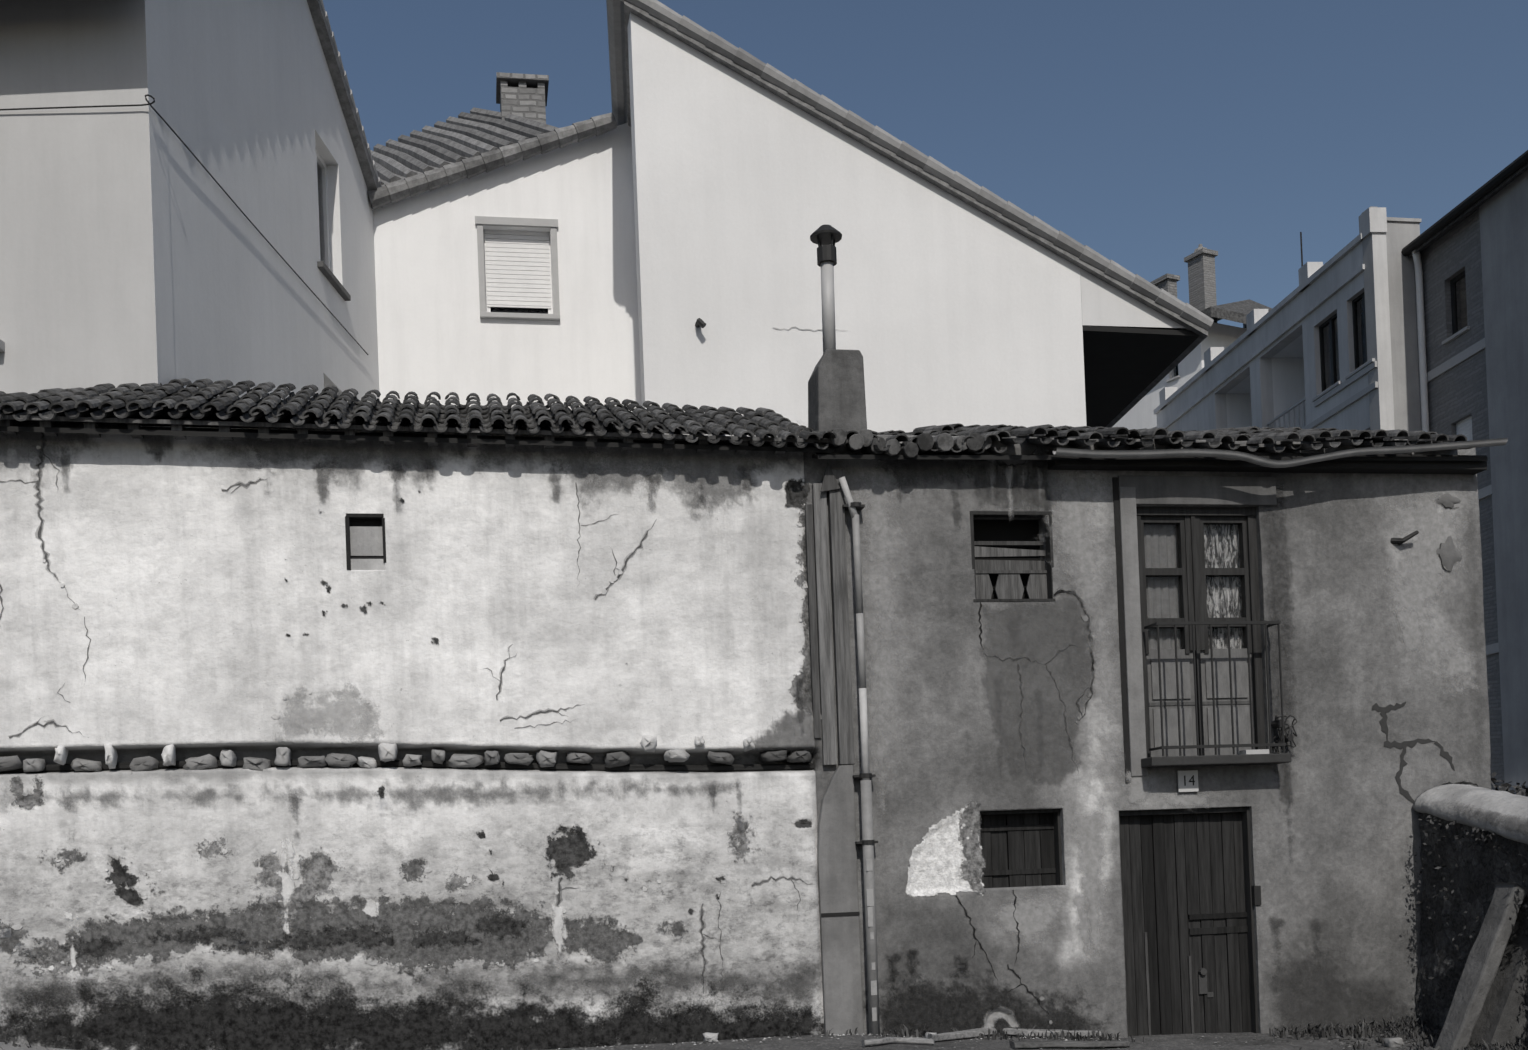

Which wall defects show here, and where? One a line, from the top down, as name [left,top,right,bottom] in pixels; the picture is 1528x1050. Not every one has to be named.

crack [575,482,657,600]
crack [0,446,91,738]
crack [485,646,576,728]
flaking render [10,773,44,810]
crack [1372,702,1478,804]
flaking render [196,838,233,858]
flaking render [543,823,664,894]
flaking render [716,811,762,899]
flaking render [906,804,984,897]
flaking render [0,847,695,980]
crack [956,890,1052,1024]
damp [0,966,824,1050]